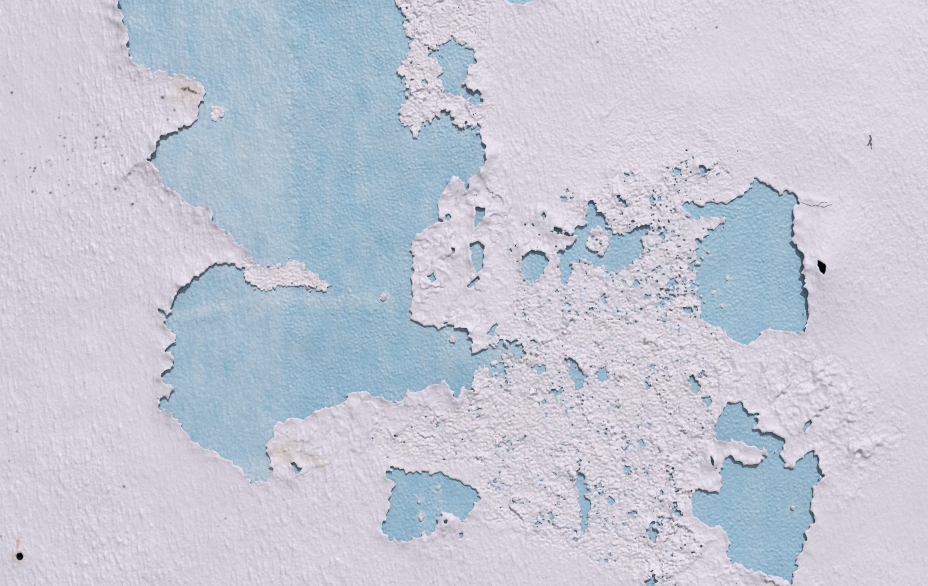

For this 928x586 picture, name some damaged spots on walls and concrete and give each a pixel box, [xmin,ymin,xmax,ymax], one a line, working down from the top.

peeling [106,0,836,586]